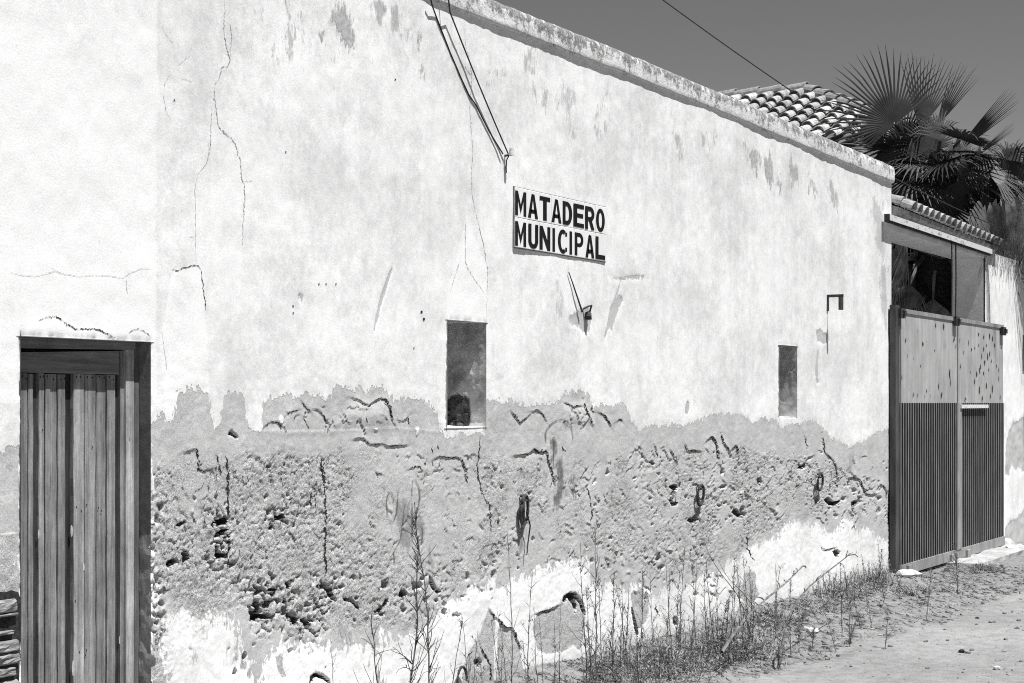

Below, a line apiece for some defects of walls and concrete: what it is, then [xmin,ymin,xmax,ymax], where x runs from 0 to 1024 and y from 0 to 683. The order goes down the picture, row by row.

crack [164,4,249,310]
crack [39,316,167,367]
crack [186,448,231,565]
crack [309,459,328,572]
crack [356,398,492,531]
flaking render [150,385,890,683]
crack [513,402,622,424]
crack [655,436,745,461]